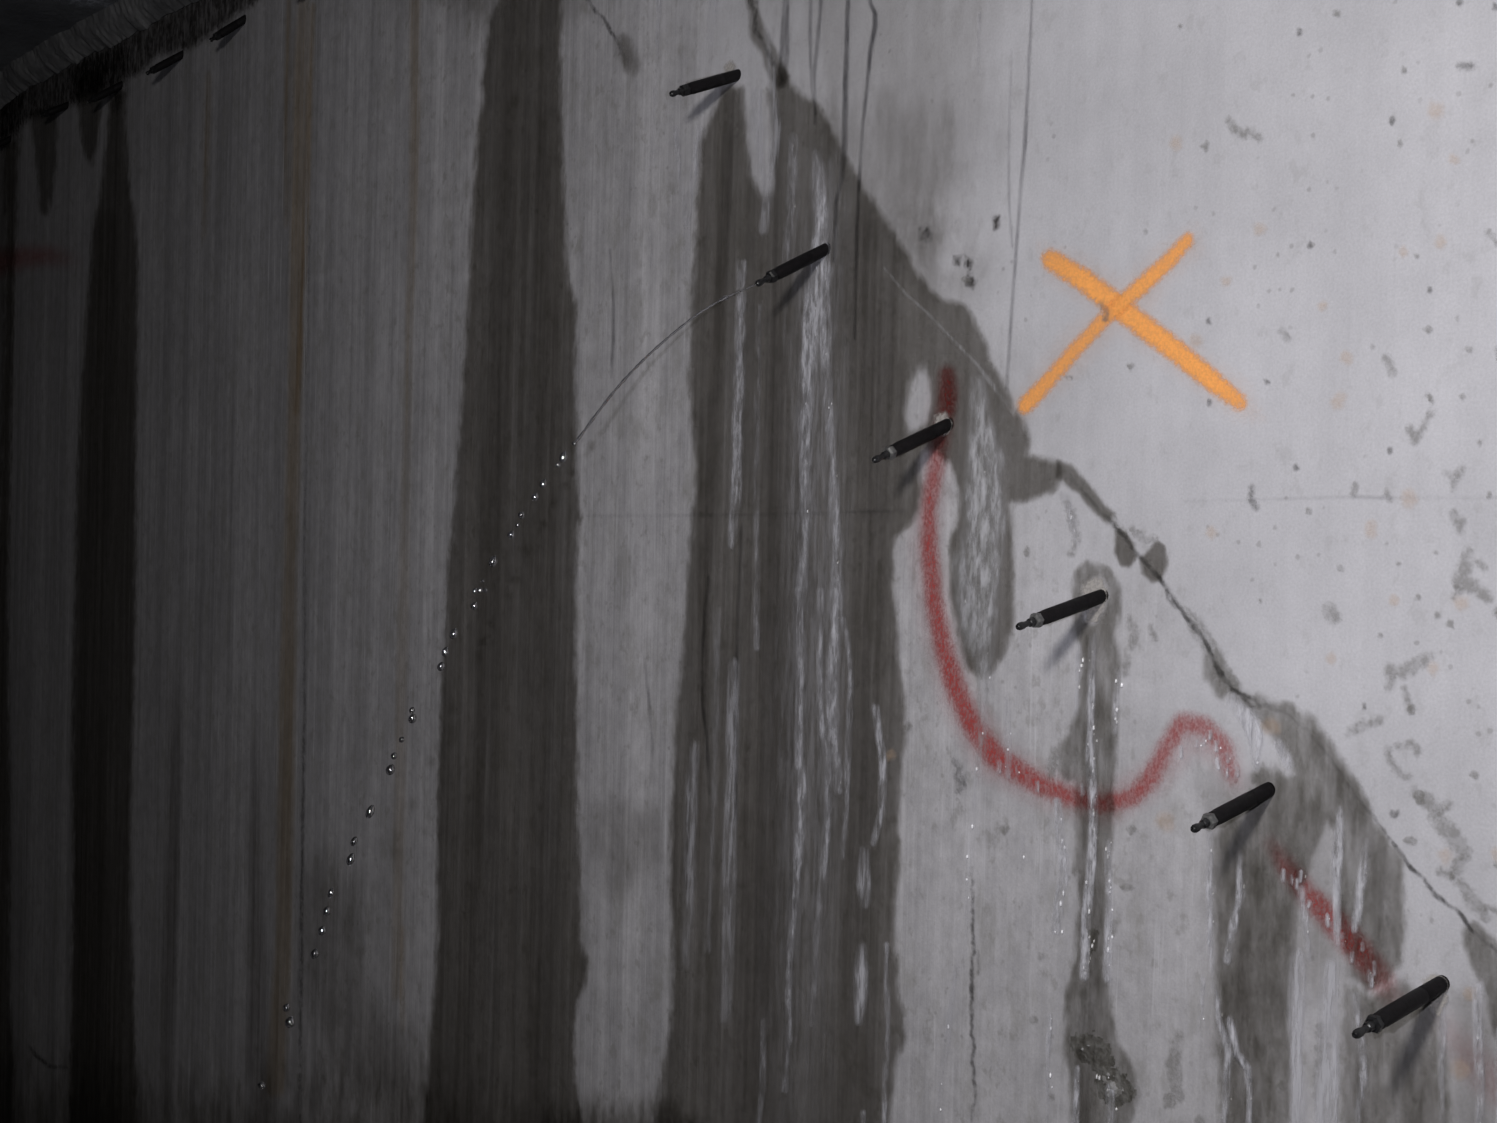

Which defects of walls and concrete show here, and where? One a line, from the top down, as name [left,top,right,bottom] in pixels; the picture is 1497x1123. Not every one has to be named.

damp [802,183,827,485]
damp [963,395,1000,655]
damp [819,589,839,669]
crack [1157,576,1248,697]
damp [796,741,805,880]
damp [877,722,886,779]
damp [1078,651,1113,980]
damp [1329,833,1367,942]
crack [1407,864,1472,931]
damp [857,957,865,1015]
damp [1203,1000,1250,1079]
damp [1292,960,1337,1123]